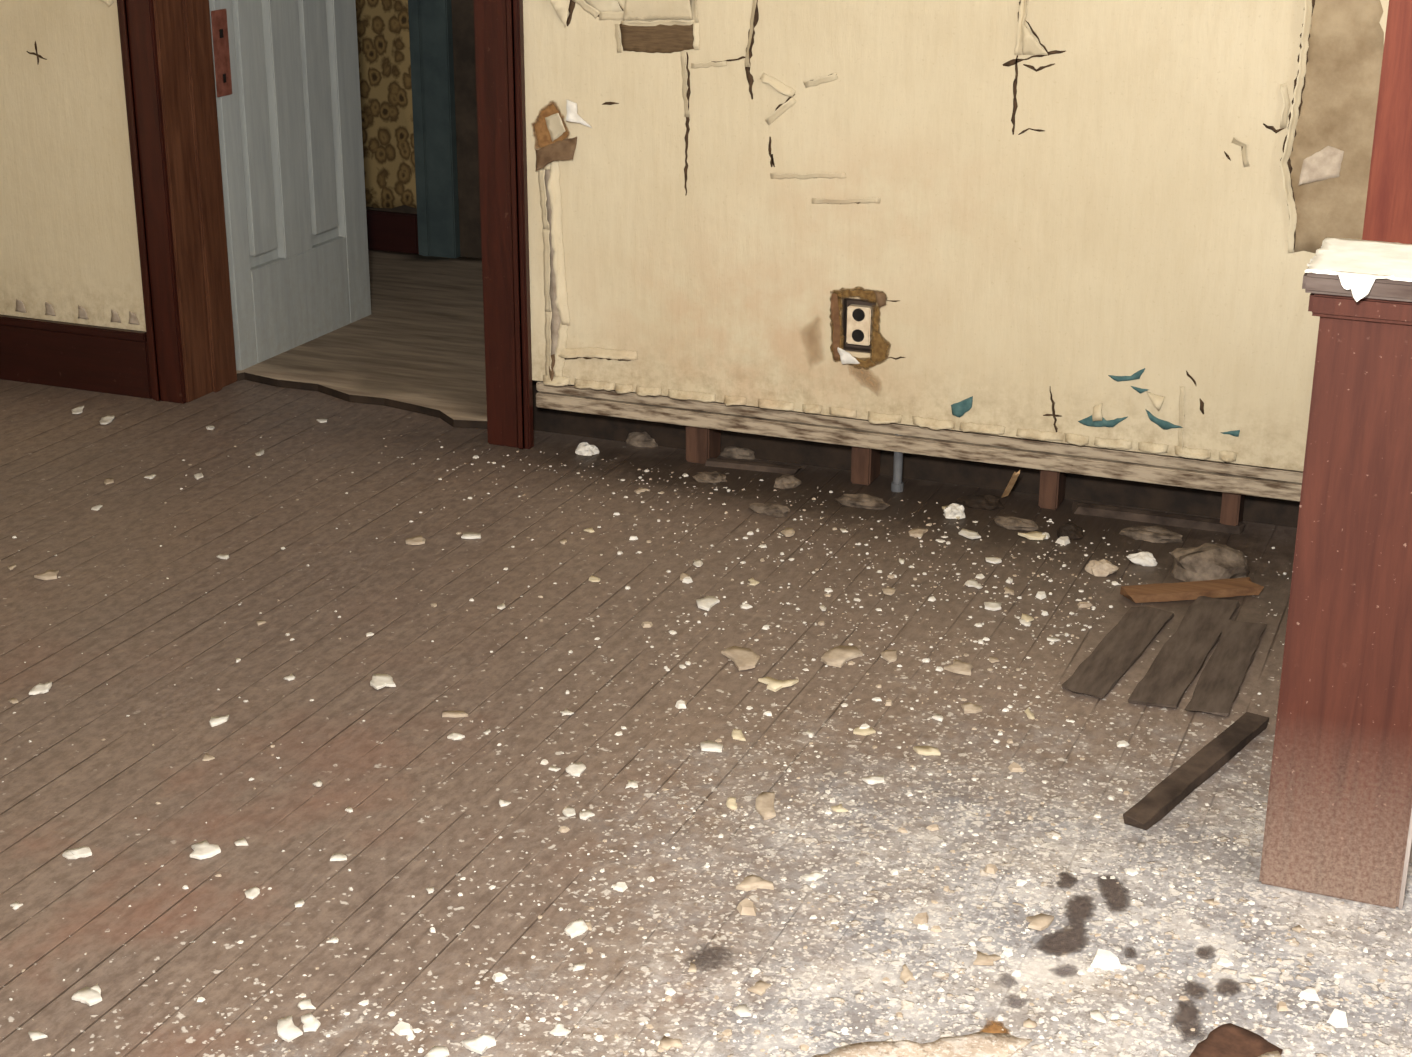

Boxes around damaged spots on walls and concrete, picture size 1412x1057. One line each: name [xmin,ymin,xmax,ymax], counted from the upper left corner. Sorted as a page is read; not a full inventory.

peeling [550,0,700,53]
crack [681,0,881,204]
crack [1003,0,1066,135]
flaking render [1280,0,1412,302]
spalling [111,309,139,325]
peeling [533,99,1240,462]